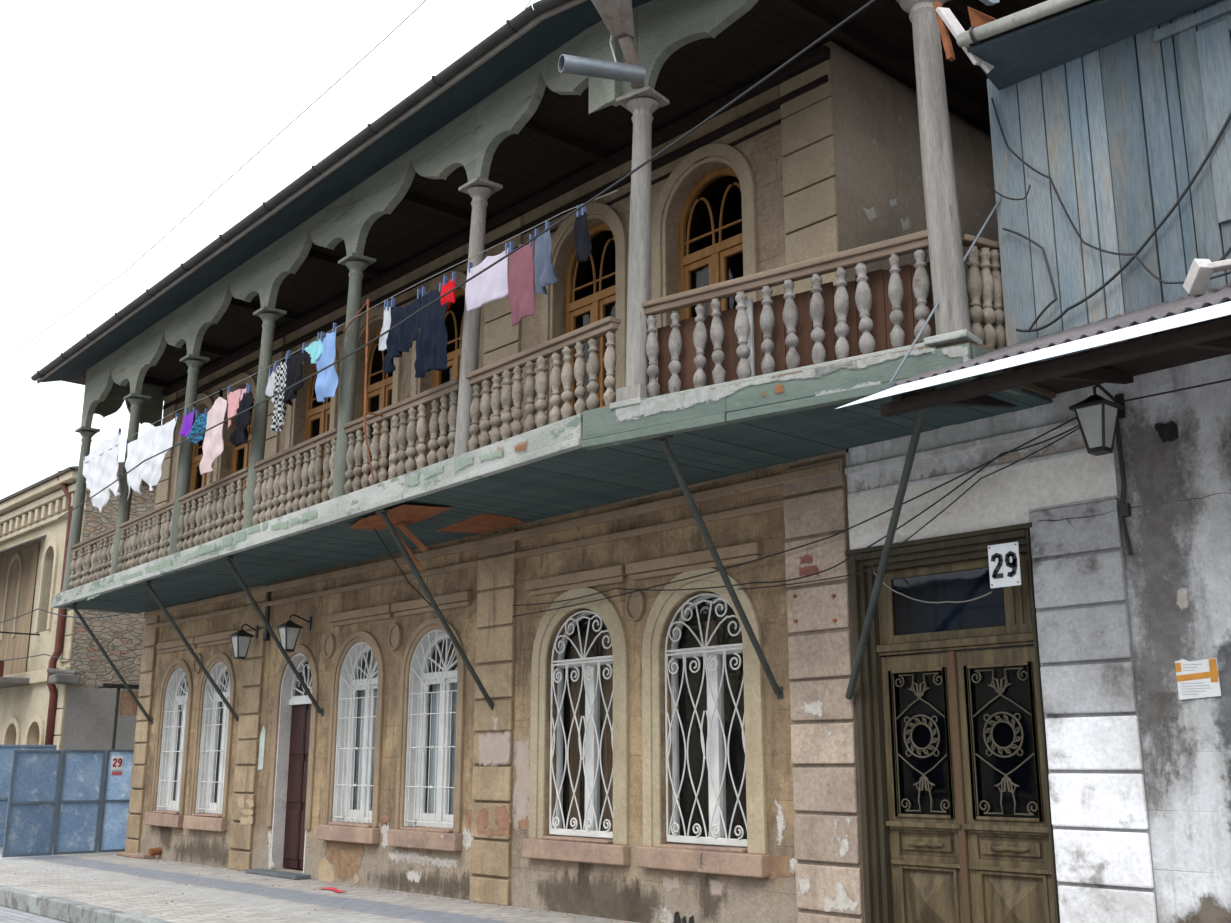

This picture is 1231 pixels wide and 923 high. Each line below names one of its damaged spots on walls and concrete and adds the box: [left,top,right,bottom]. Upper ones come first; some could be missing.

peeling [614,346,970,422]
leakage [1215,644,1231,746]
peeling [801,700,832,738]
peeling [774,798,786,845]
peeling [831,817,853,858]
leakage [539,864,656,923]
leakage [673,877,719,923]
peeling [789,858,811,895]
peeling [823,882,858,913]
leakage [1178,894,1231,923]